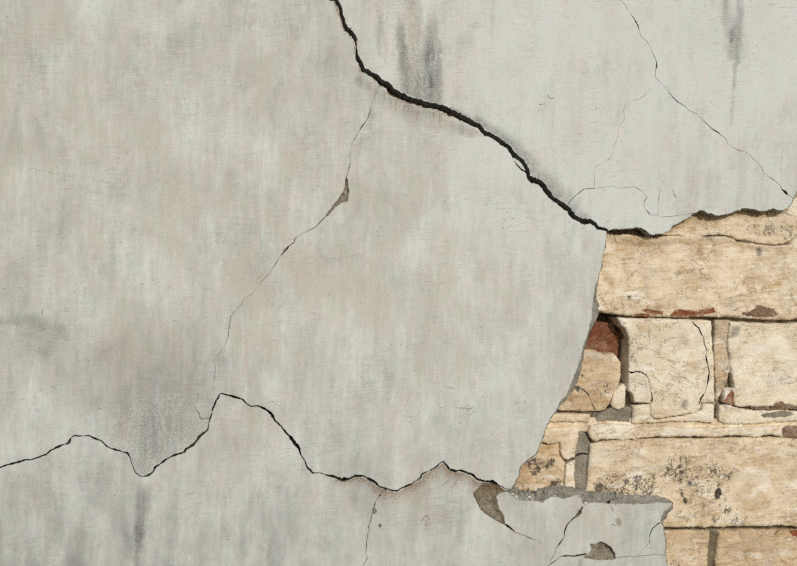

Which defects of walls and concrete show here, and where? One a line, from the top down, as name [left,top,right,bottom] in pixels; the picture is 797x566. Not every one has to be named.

crack [330,0,793,250]
crack [0,218,505,565]
spalling [473,192,797,566]
crack [629,371,653,404]
crack [692,321,729,404]
crack [506,517,587,566]
crack [617,523,660,558]